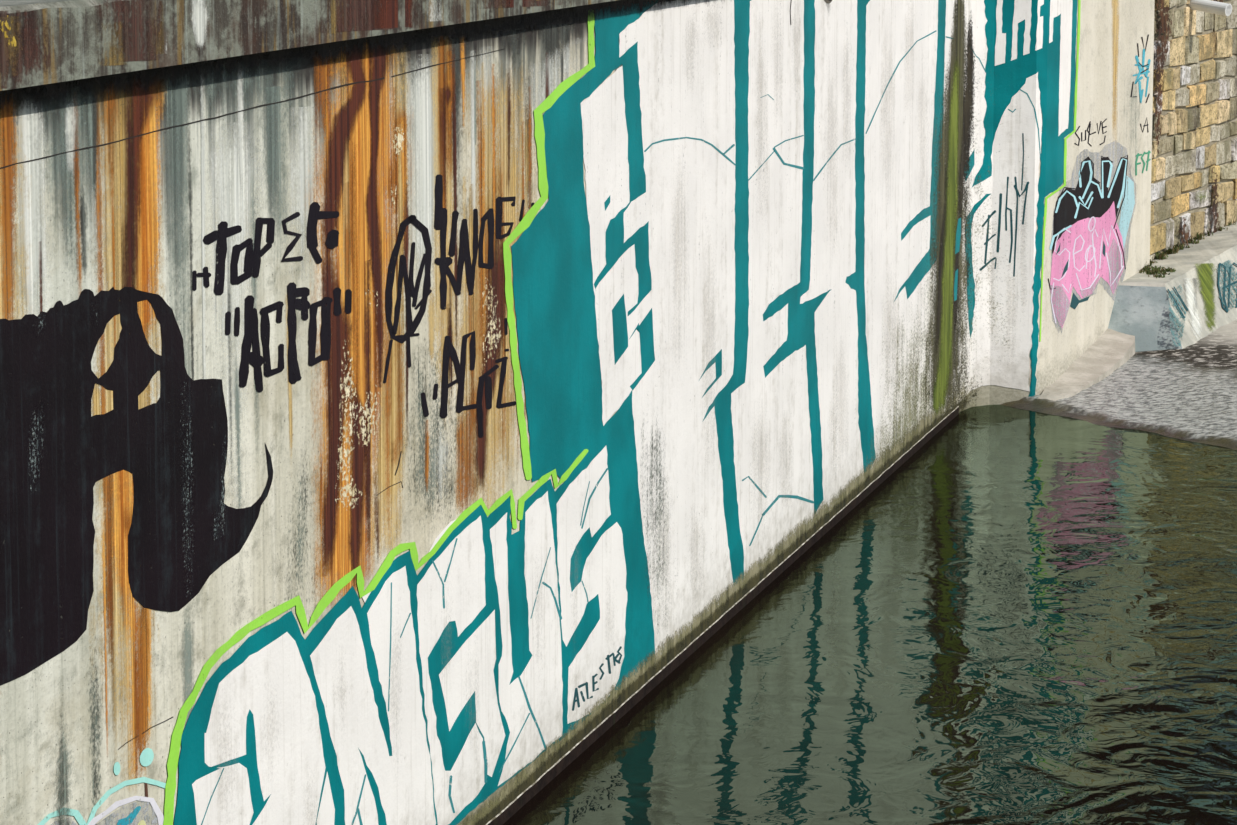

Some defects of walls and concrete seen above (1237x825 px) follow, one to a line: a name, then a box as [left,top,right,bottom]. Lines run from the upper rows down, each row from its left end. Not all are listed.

peeling [0,15,17,47]
rust [0,10,51,320]
rust [73,110,82,283]
rust [93,314,122,416]
rust [99,470,151,779]
rust [96,79,160,353]
rust [138,379,157,409]
leakage [288,470,317,601]
leakage [0,0,690,550]
rust [314,0,419,602]
rust [428,36,532,510]
leakage [459,15,990,825]